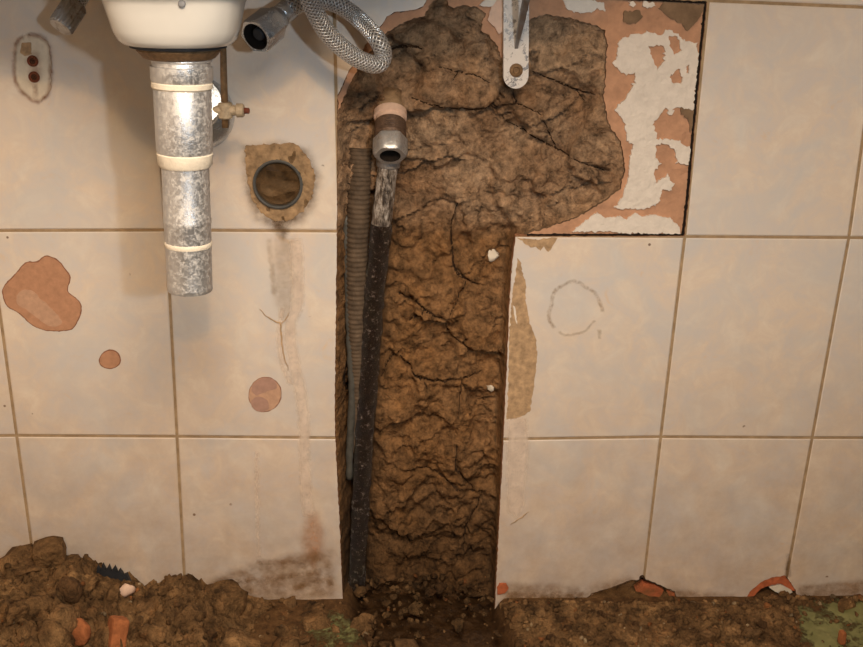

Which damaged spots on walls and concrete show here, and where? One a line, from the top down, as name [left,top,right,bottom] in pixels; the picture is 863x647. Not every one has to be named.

crack [391,43,422,51]
crack [439,67,490,83]
crack [532,71,595,101]
crack [411,90,604,170]
crack [399,203,475,348]
spalling [335,0,706,599]
crack [342,359,350,393]
crack [381,351,480,419]
crack [405,445,482,550]